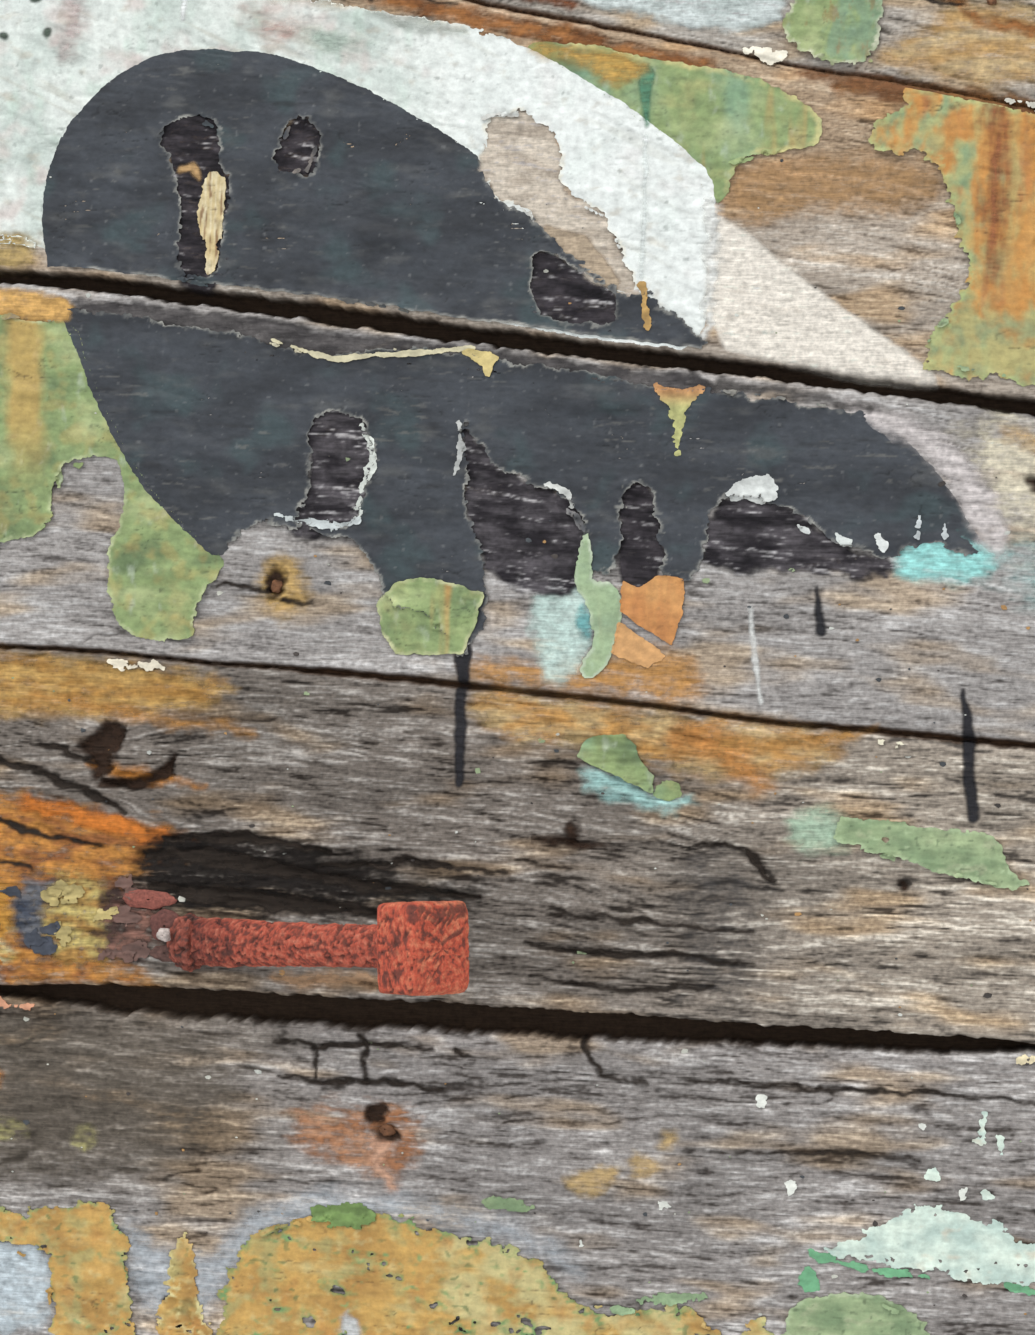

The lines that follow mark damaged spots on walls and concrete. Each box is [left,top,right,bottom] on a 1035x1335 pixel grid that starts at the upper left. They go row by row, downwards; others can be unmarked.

peeling [585,0,884,66]
peeling [0,0,822,350]
peeling [868,88,1035,387]
peeling [0,308,986,678]
peeling [833,816,1030,891]
peeling [755,1094,768,1108]
peeling [784,1180,797,1196]
peeling [924,1167,941,1182]
peeling [972,1111,1005,1155]
peeling [0,1200,136,1335]
peeling [155,1202,721,1335]
peeling [742,1187,1035,1335]